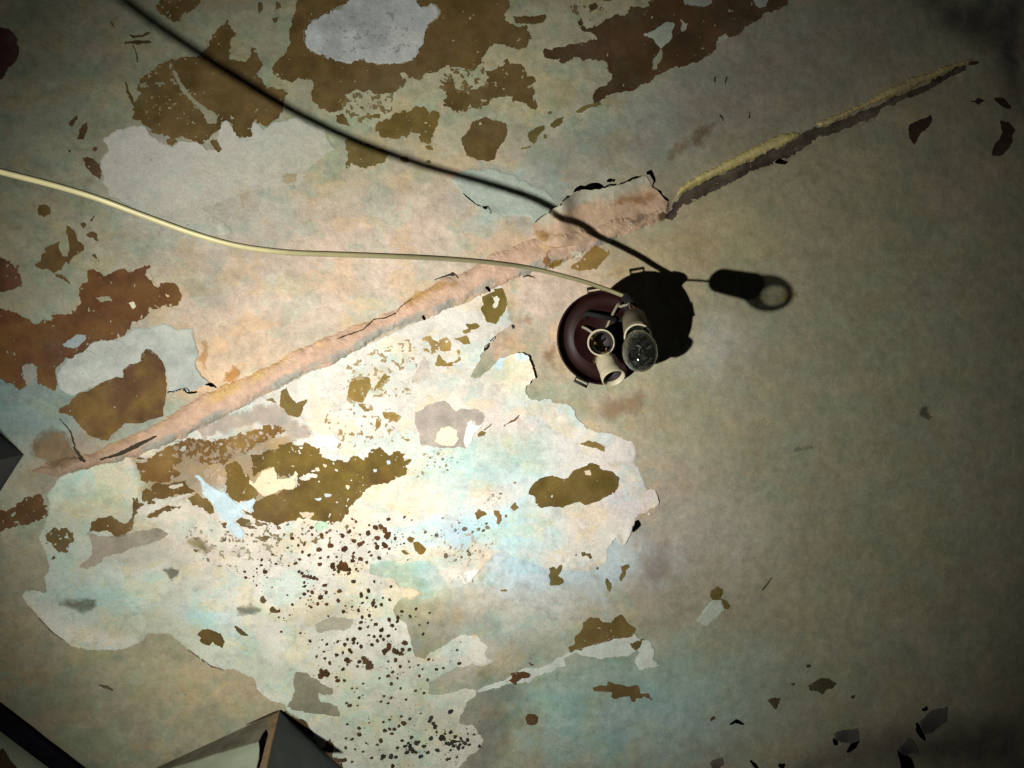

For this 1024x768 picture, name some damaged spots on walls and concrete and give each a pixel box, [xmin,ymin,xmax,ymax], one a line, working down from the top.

peeling [543,0,788,113]
peeling [69,0,564,236]
peeling [908,115,932,145]
peeling [971,97,1015,156]
peeling [0,216,209,440]
crack [337,299,411,339]
crack [59,419,157,462]
peeling [0,286,660,768]